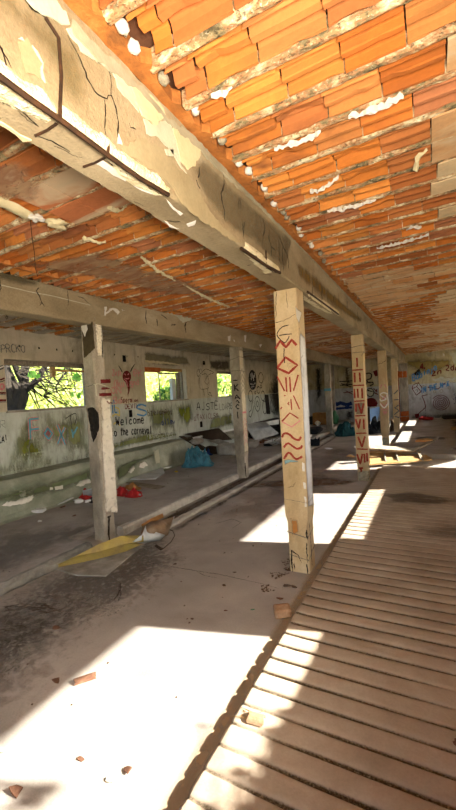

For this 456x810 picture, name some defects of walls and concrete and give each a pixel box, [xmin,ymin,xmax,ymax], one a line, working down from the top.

crack [2,102,82,158]
crack [67,35,135,134]
peeling [0,0,378,327]
damp [198,166,290,266]